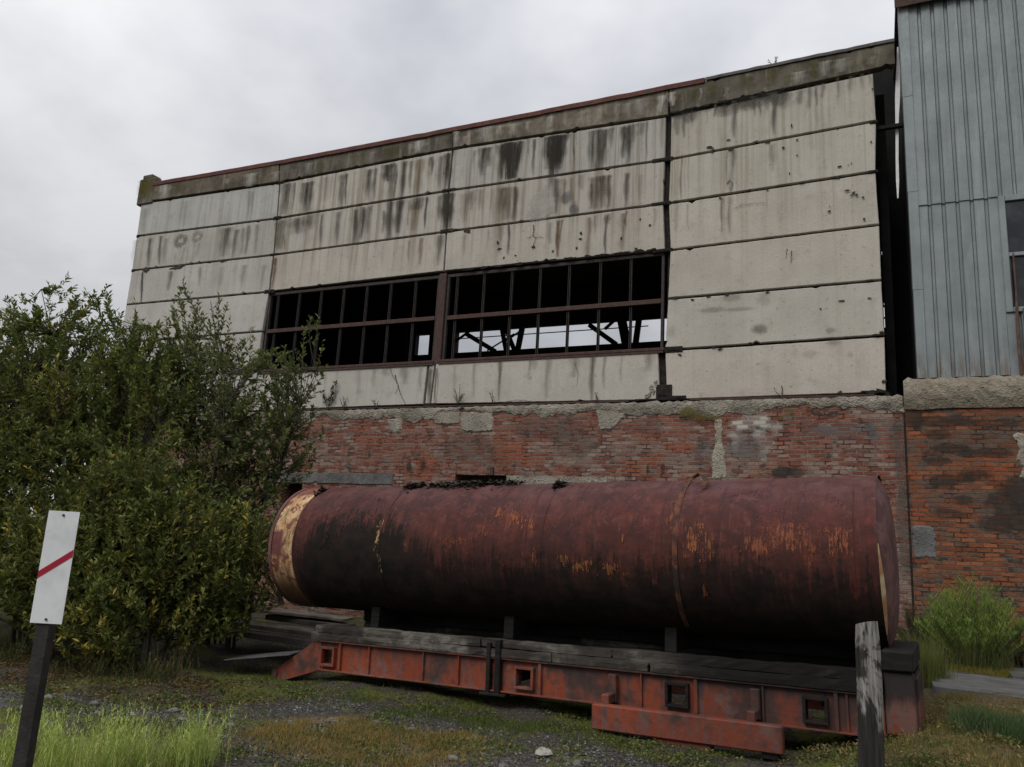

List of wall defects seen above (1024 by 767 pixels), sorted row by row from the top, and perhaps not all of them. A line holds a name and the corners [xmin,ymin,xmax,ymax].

leakage [140,178,167,198]
leakage [367,161,428,234]
leakage [431,132,458,179]
leakage [438,192,454,251]
leakage [481,124,578,246]
leakage [591,129,607,158]
leakage [591,175,611,245]
leakage [622,124,634,153]